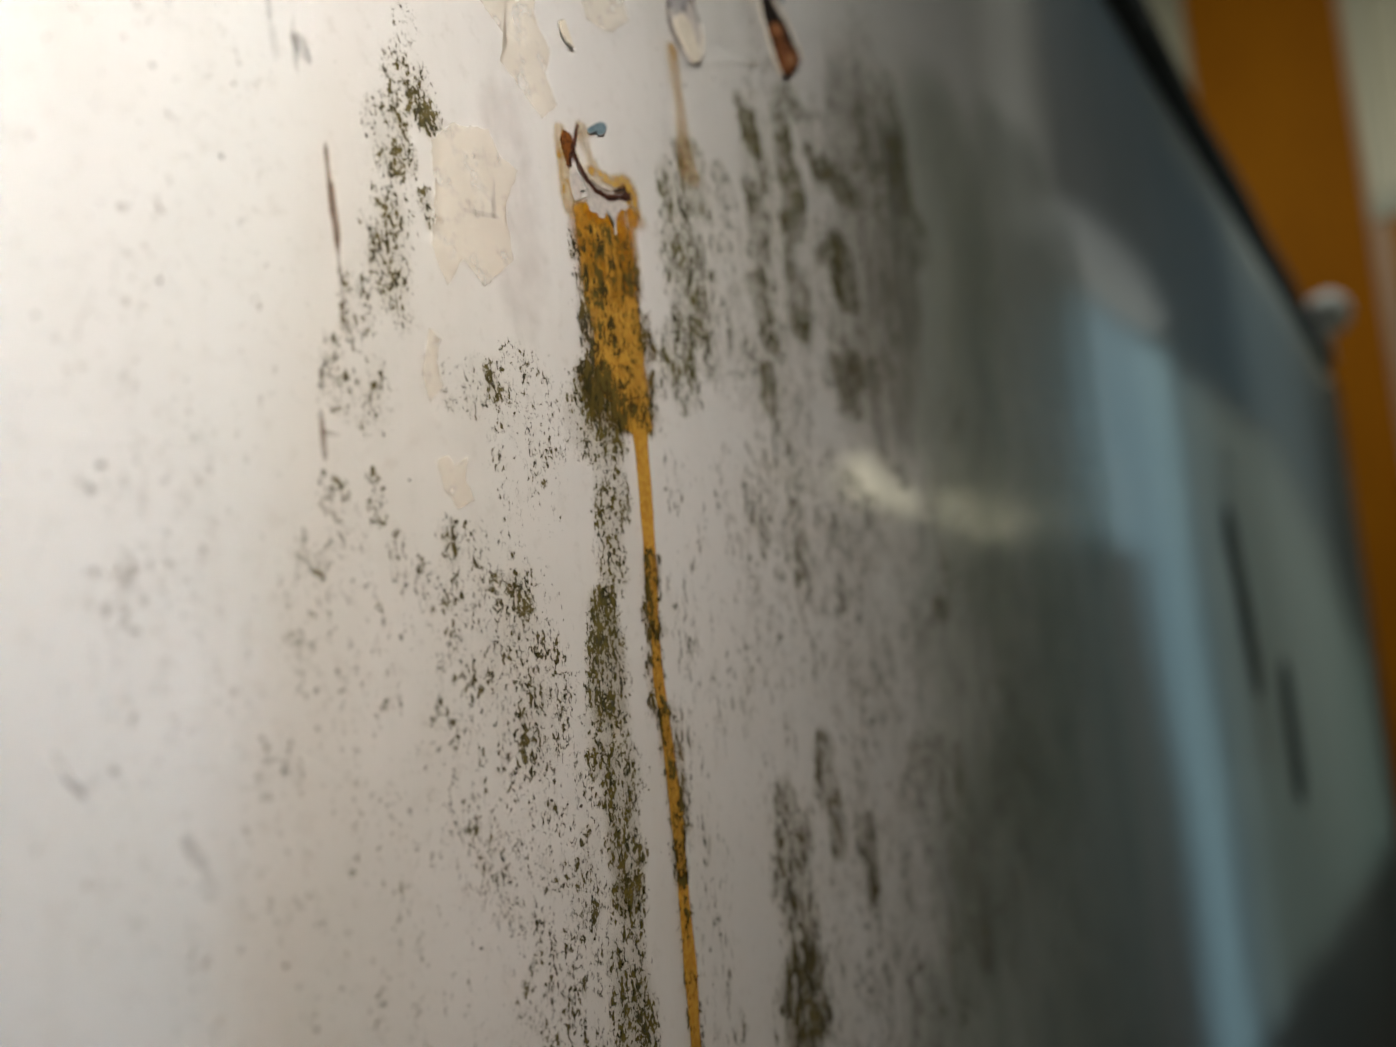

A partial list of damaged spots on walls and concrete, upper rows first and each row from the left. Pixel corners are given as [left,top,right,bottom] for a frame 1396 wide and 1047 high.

water stain [275,470,364,745]
water stain [317,5,443,437]
water stain [333,340,661,1047]
peeling [560,122,632,235]
rust [557,127,705,1047]
water stain [649,6,1048,1047]